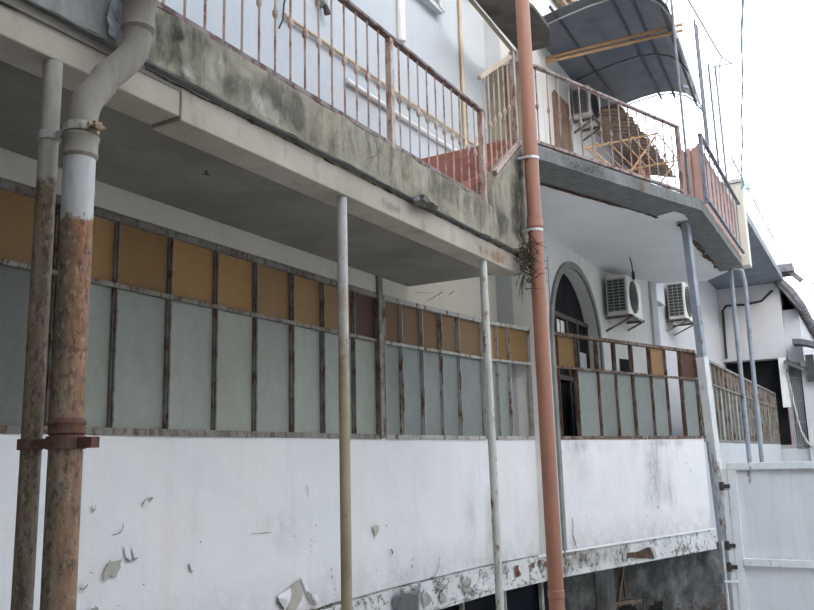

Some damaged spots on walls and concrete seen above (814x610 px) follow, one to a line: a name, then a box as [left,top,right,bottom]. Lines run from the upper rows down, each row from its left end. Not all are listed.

leakage [499,155,523,237]
spalling [623,547,658,560]
peeling [103,559,123,580]
peeling [422,584,455,610]